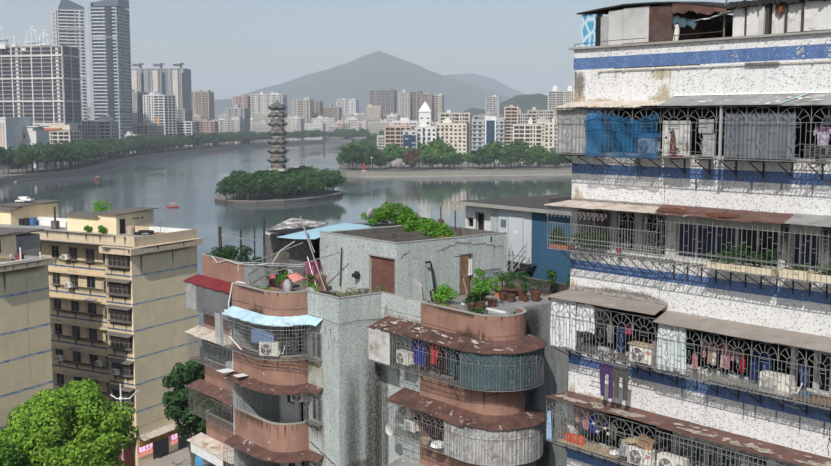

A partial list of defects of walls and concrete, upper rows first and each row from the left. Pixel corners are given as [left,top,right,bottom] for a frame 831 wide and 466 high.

water stain [575,72,584,97]
corrosion [668,129,688,157]
corrosion [659,208,737,217]
crack [437,236,504,257]
water stain [367,363,388,466]
peeling [556,395,646,417]
water stain [348,403,357,466]
peeling [673,423,774,454]
peeling [794,455,831,466]